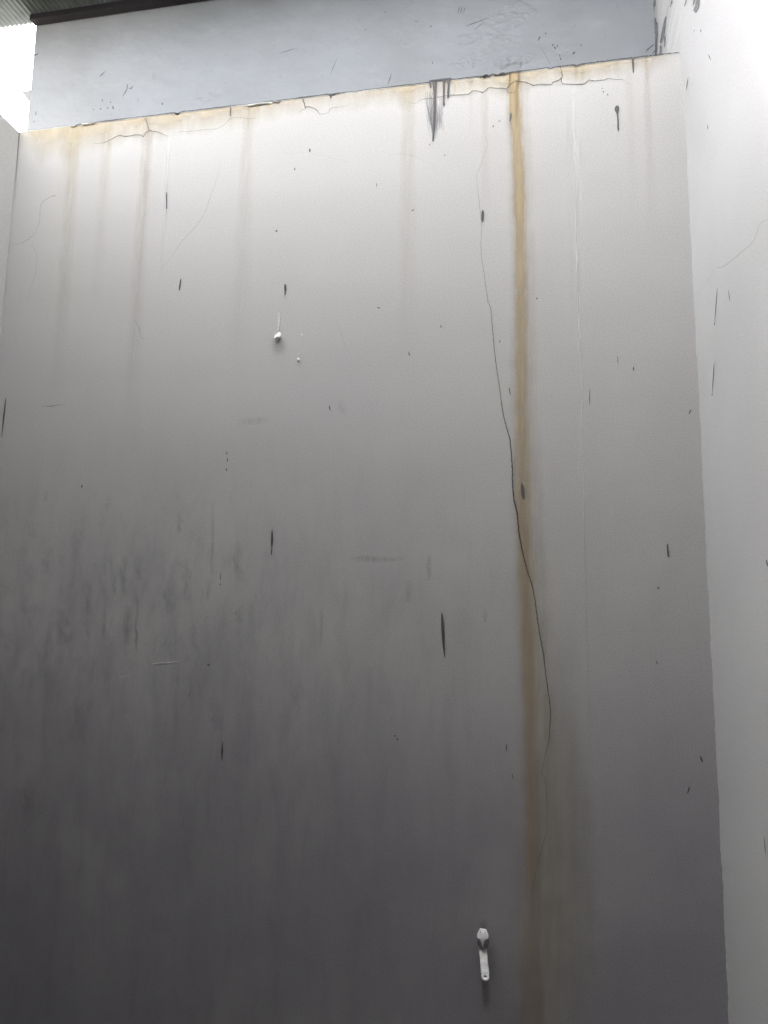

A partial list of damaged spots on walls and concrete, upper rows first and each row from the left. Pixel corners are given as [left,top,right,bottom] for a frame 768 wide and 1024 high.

crack [74,44,678,140]
rust [509,72,524,391]
crack [489,304,551,770]